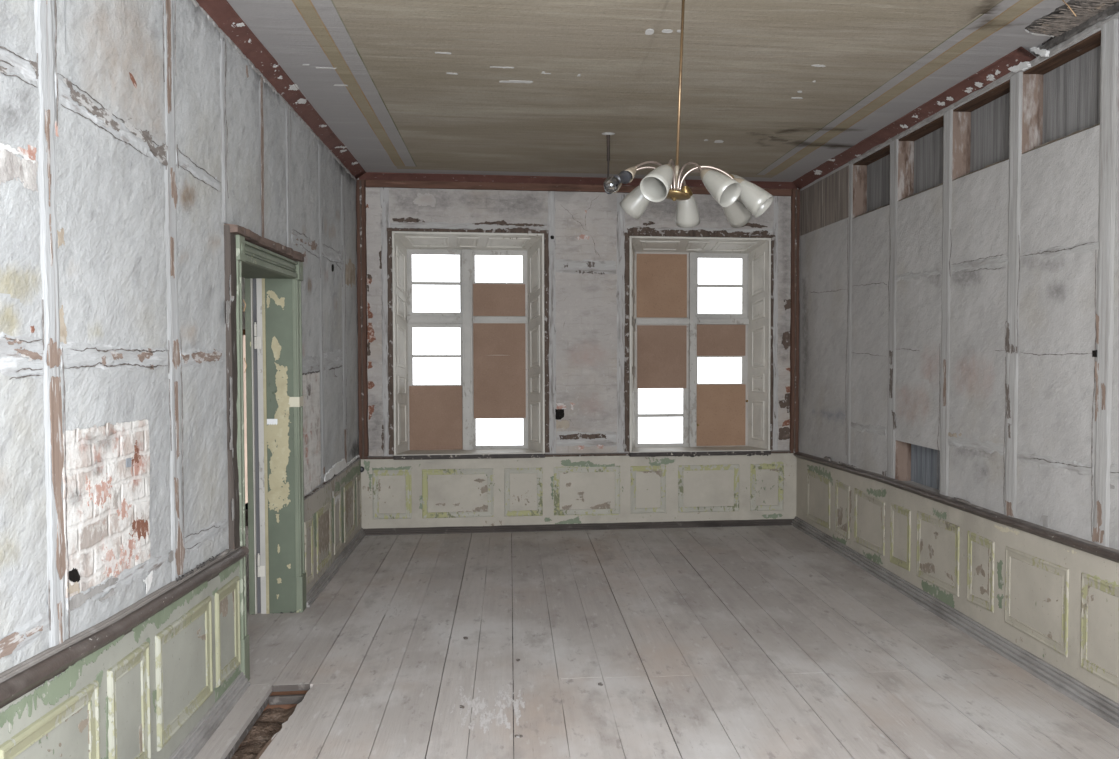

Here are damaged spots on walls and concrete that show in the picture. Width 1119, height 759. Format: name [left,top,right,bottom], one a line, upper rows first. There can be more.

peeling [62,78,178,208]
spalling [331,250,382,389]
flaking render [5,305,154,644]
flaking render [267,336,411,557]
peeling [436,478,488,512]
peeling [542,433,619,524]
peeling [920,508,955,608]
peeling [976,548,1004,609]
peeling [995,500,1020,535]
peeling [1092,500,1104,543]
peeling [0,561,241,759]